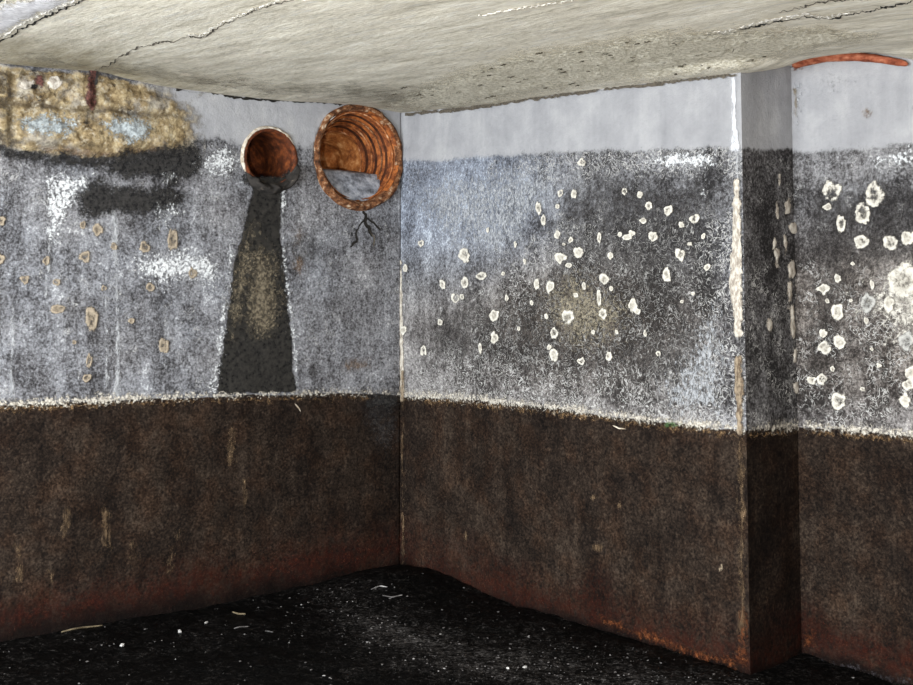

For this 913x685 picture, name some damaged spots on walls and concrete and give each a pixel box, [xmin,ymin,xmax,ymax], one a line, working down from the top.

crack [0,0,84,42]
crack [102,0,294,67]
crack [686,0,912,40]
rust [792,53,908,70]
flaking render [0,63,206,166]
crack [349,211,381,248]
leakage [0,77,913,523]